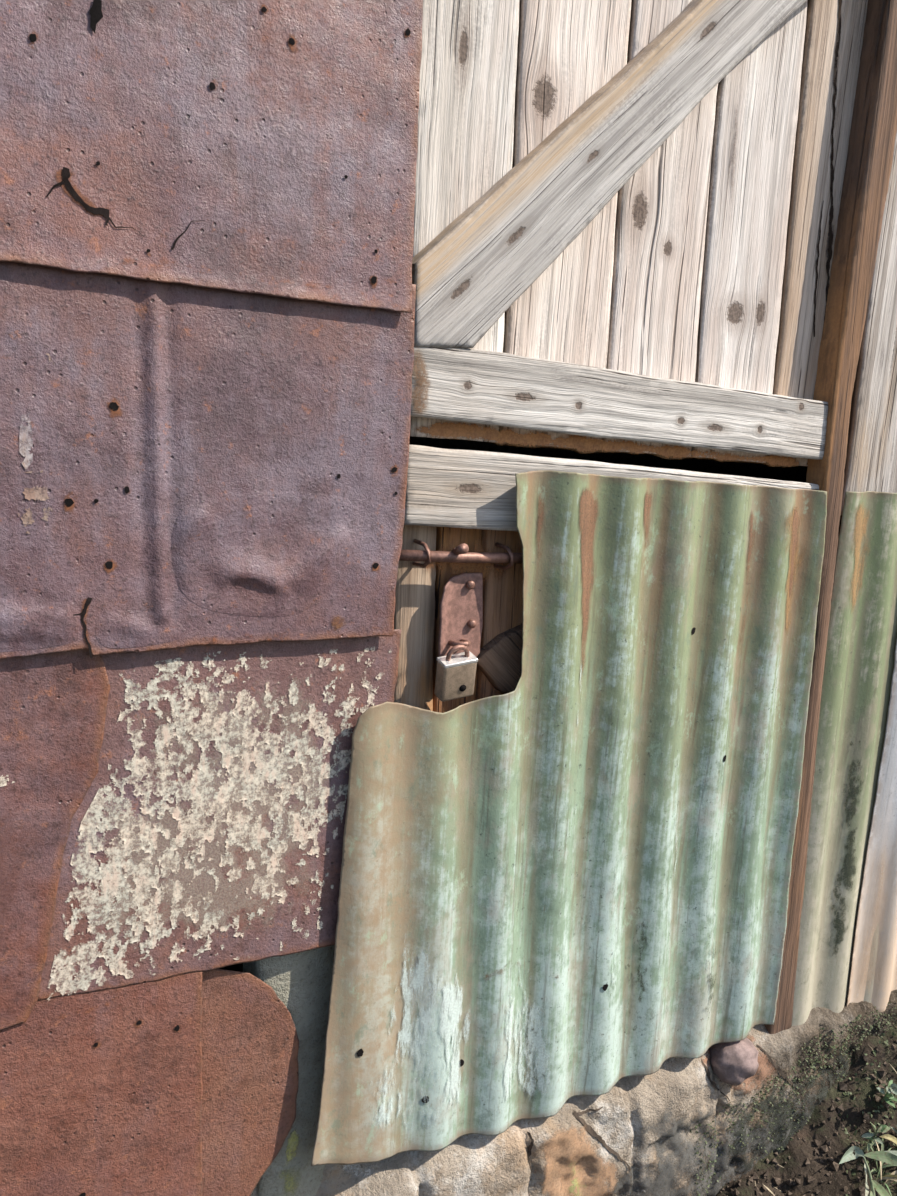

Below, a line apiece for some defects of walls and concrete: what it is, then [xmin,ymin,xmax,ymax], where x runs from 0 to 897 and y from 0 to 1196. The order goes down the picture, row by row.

crack [46,167,144,237]
crack [171,220,204,250]
crack [81,597,92,658]
corrosion [0,0,423,1196]
corrosion [429,543,505,579]
corrosion [579,489,598,660]
corrosion [644,494,652,539]
corrosion [747,514,755,569]
corrosion [786,508,802,629]
peeling [47,647,392,1001]
leakage [832,760,864,954]
crack [573,1106,632,1187]